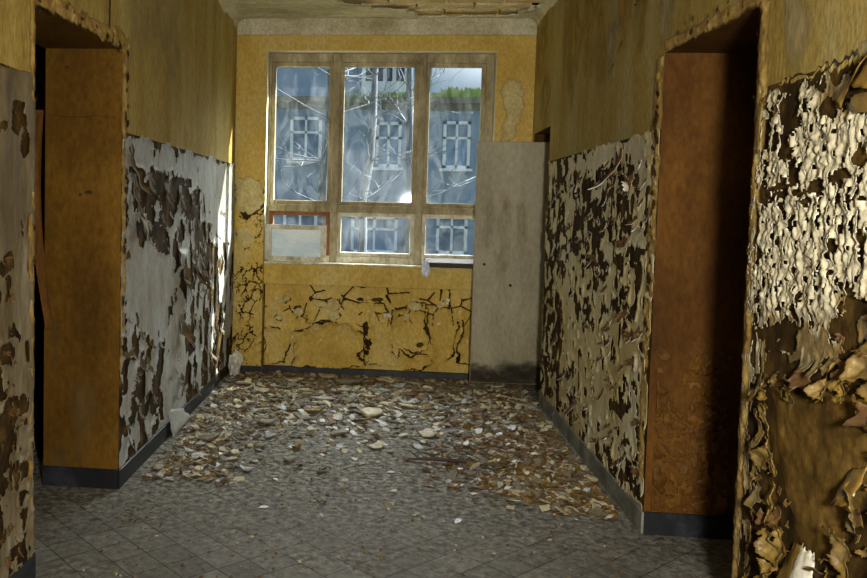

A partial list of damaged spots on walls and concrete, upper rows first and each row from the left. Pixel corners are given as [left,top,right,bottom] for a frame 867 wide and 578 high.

peeling [0,0,472,578]
spalling [341,0,541,15]
flaking render [500,79,524,141]
peeling [540,0,867,578]